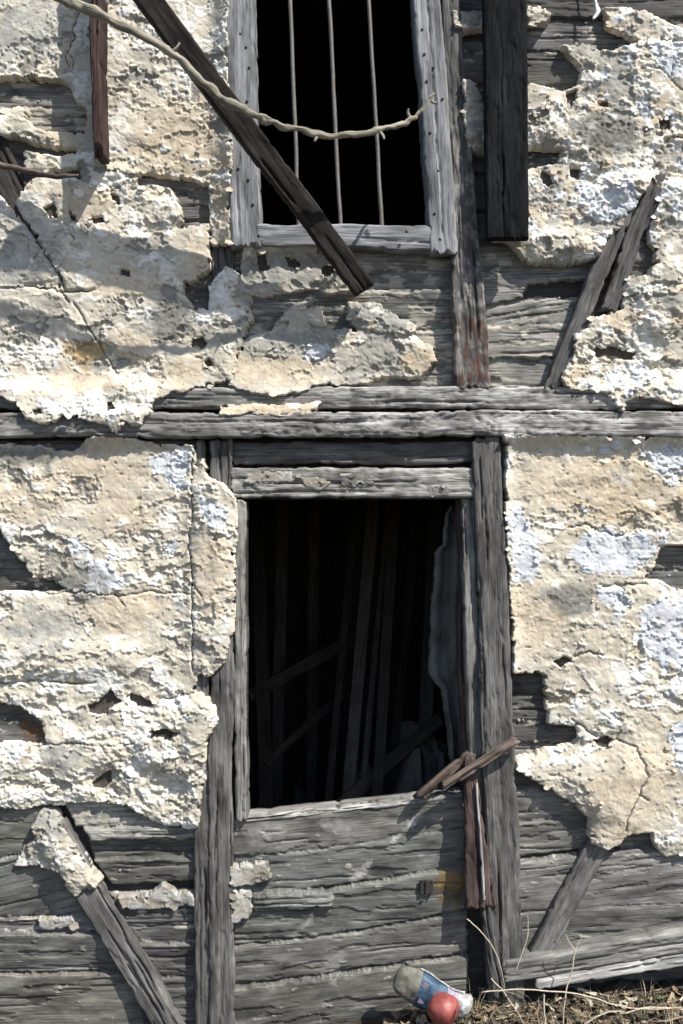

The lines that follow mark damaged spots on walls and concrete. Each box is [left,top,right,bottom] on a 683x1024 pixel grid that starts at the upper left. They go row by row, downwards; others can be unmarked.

peeling [452,10,482,37]
peeling [460,79,484,159]
crack [2,204,120,375]
peeling [479,0,683,412]
peeling [0,0,451,911]
crack [46,453,200,699]
peeling [500,433,683,948]
crack [575,722,648,831]
peeling [38,913,79,931]